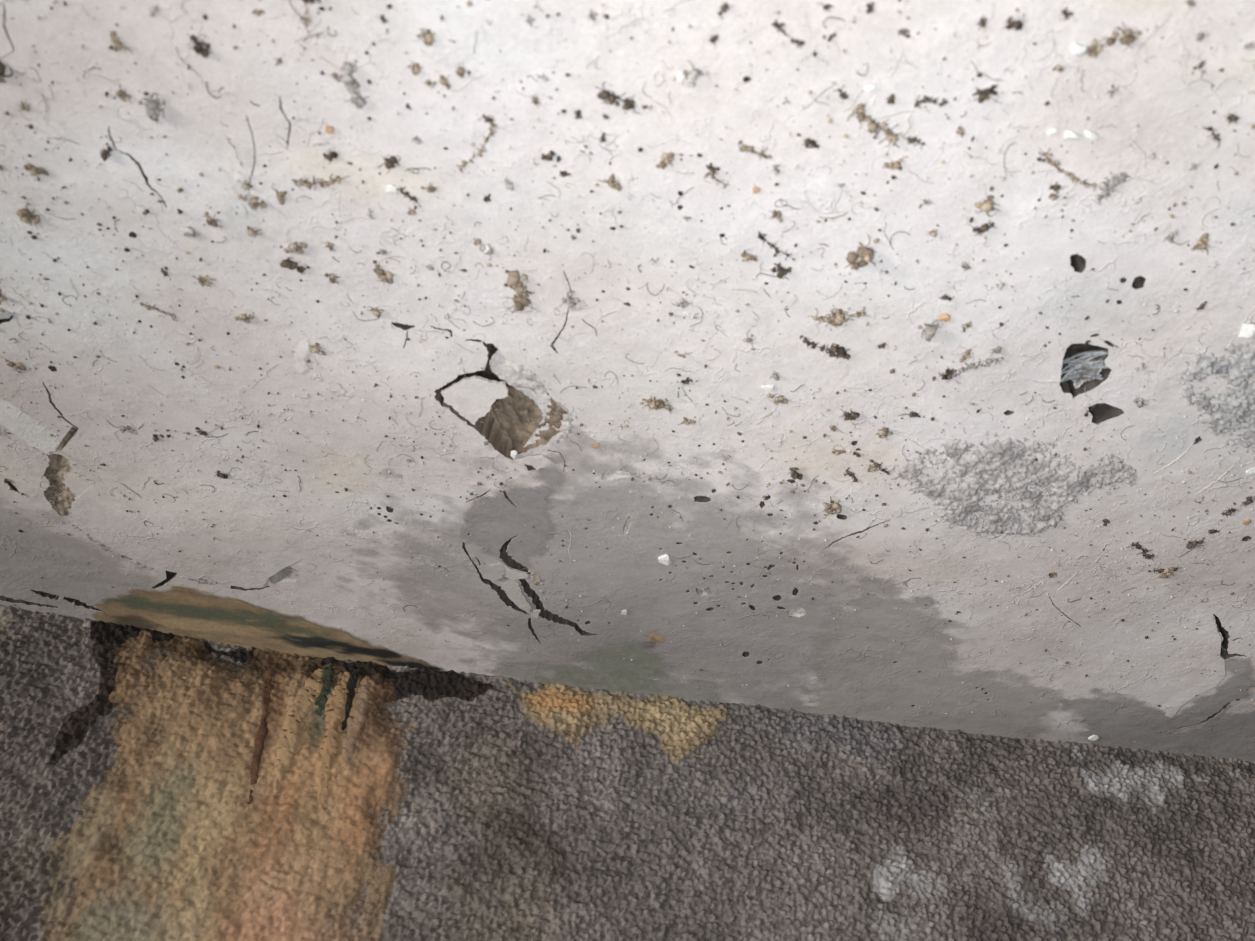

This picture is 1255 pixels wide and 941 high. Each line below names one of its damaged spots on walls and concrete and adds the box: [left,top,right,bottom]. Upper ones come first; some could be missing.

spalling [431,326,575,472]
spalling [1059,334,1124,424]
peeling [1176,322,1255,453]
peeling [884,431,1137,537]
water stain [50,643,133,765]
water stain [0,511,442,672]
crack [462,489,601,644]
water stain [390,467,1255,810]
crack [1155,612,1247,734]